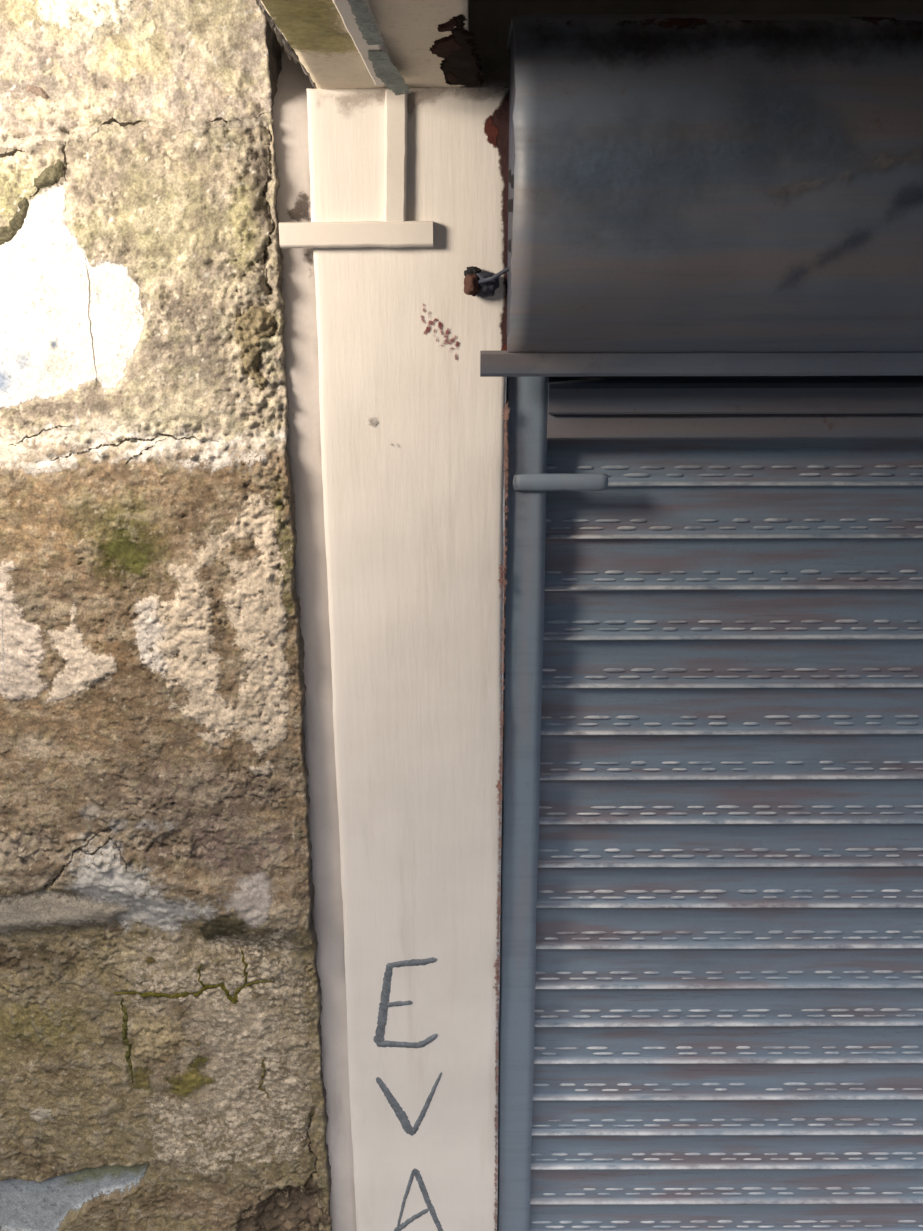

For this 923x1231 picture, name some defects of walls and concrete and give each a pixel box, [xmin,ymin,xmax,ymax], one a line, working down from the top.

crack [0,149,25,158]
crack [30,132,69,197]
spalling [0,159,145,408]
crack [100,117,146,127]
corrosion [484,93,509,351]
crack [6,425,219,465]
peeling [0,560,117,703]
peeling [132,494,292,776]
peeling [0,913,332,1231]
crack [114,948,274,1084]
crack [258,1057,271,1100]